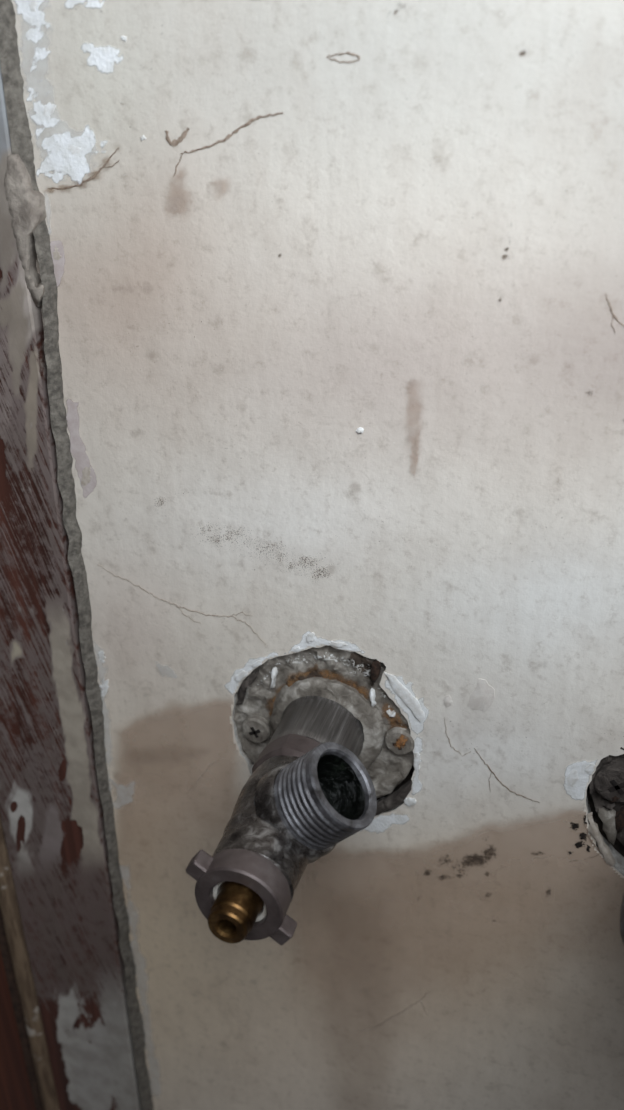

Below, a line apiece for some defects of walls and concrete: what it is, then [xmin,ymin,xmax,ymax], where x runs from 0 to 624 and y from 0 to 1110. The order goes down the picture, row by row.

peeling [15,0,50,72]
peeling [81,36,127,73]
peeling [27,88,108,183]
peeling [50,241,65,287]
peeling [66,399,97,497]
crack [98,564,266,645]
spalling [225,631,365,694]
corrosion [267,667,369,716]
spalling [360,672,429,833]
corrosion [382,704,408,748]
crack [444,718,540,803]
spalling [564,760,597,800]